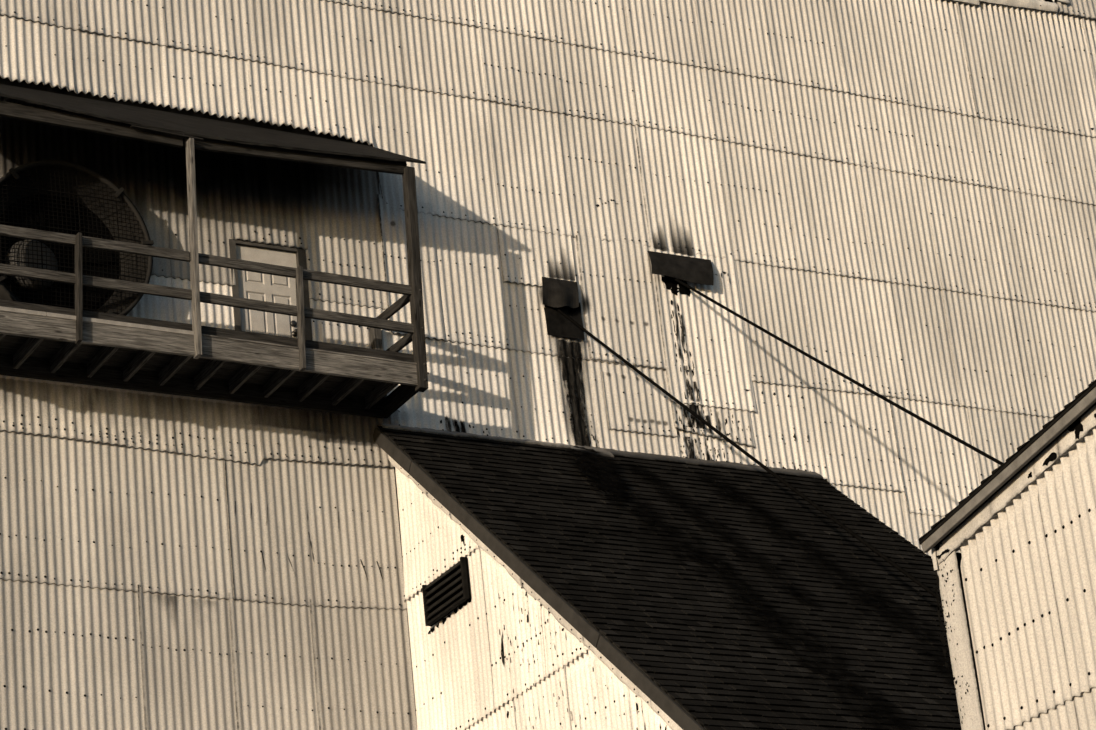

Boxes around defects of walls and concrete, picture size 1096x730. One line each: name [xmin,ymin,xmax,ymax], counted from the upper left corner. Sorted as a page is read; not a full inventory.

rust [558,339,599,448]
rust [671,295,700,401]
peeling [498,592,567,669]